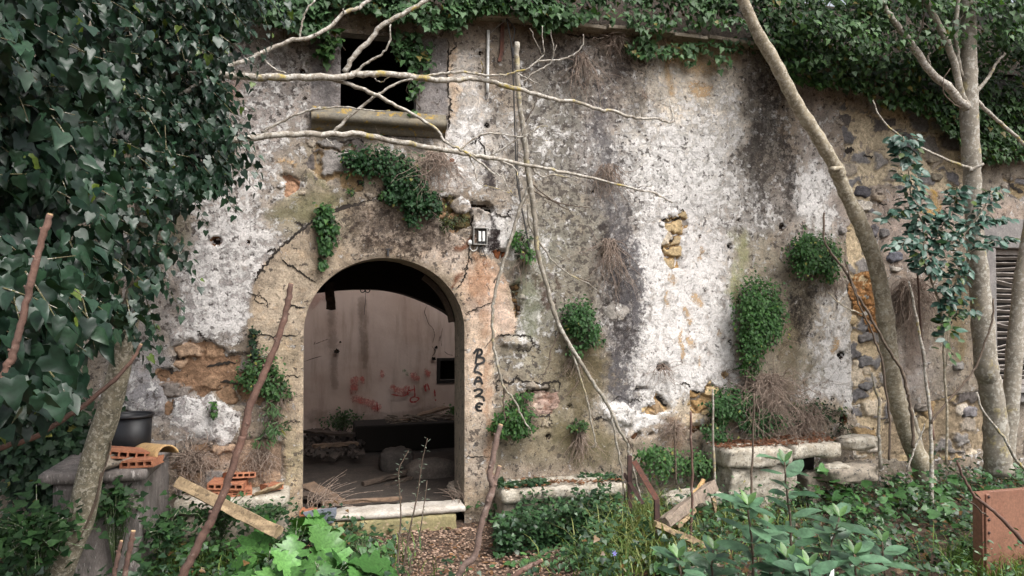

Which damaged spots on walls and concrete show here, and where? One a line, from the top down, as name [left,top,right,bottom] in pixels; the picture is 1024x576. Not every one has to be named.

flaking render [276,139,384,201]
crack [246,196,377,309]
flaking render [659,207,688,305]
flaking render [155,339,270,416]
crack [495,334,561,427]
flaking render [640,393,667,415]